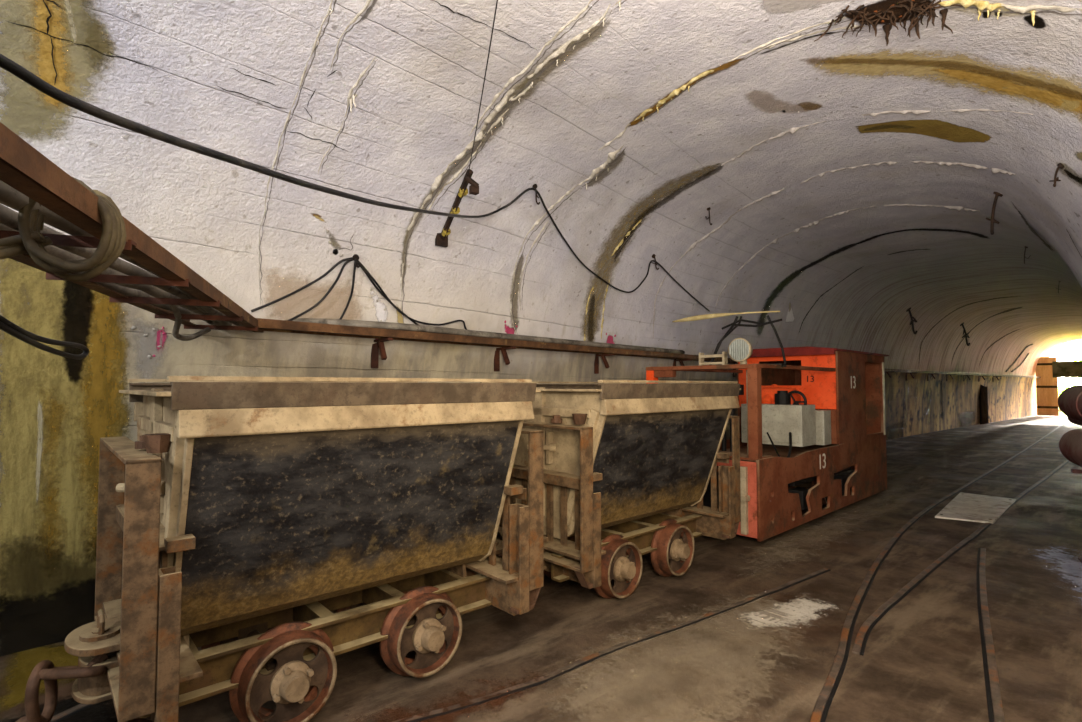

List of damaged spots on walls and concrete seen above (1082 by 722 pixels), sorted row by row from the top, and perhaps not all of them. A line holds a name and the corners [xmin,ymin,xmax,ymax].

damp [0,0,113,140]
crack [7,0,158,83]
crack [432,0,535,49]
spalling [814,0,963,46]
crack [218,0,378,305]
damp [510,58,743,334]
damp [862,109,1033,117]
damp [911,161,1016,176]
damp [715,204,989,335]
damp [1030,546,1082,605]